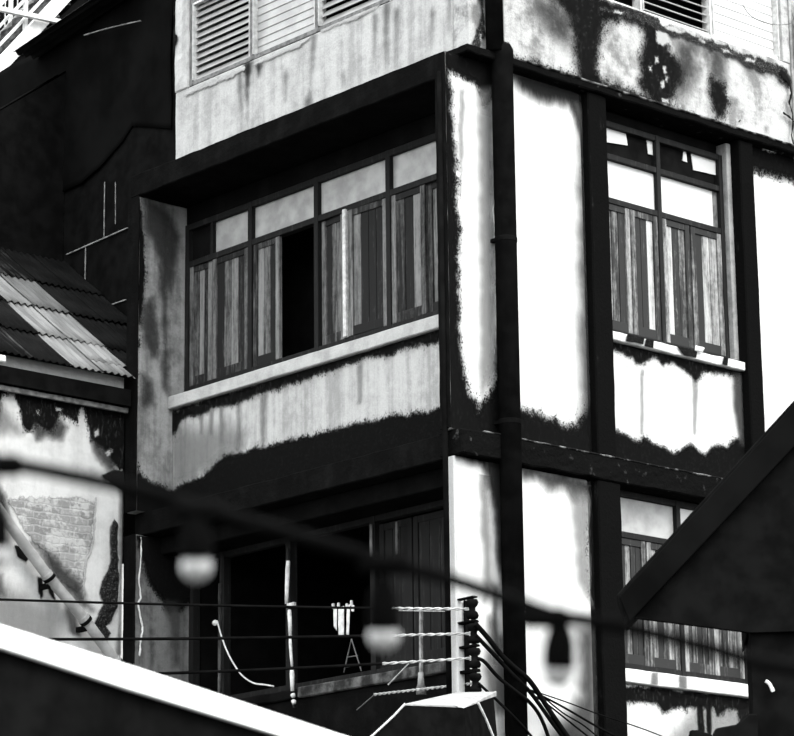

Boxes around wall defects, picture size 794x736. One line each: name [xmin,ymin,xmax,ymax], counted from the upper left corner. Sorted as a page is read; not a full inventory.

water stain [513,0,697,114]
water stain [708,49,732,123]
water stain [753,147,794,184]
water stain [137,51,499,499]
water stain [0,383,124,471]
water stain [613,342,745,478]